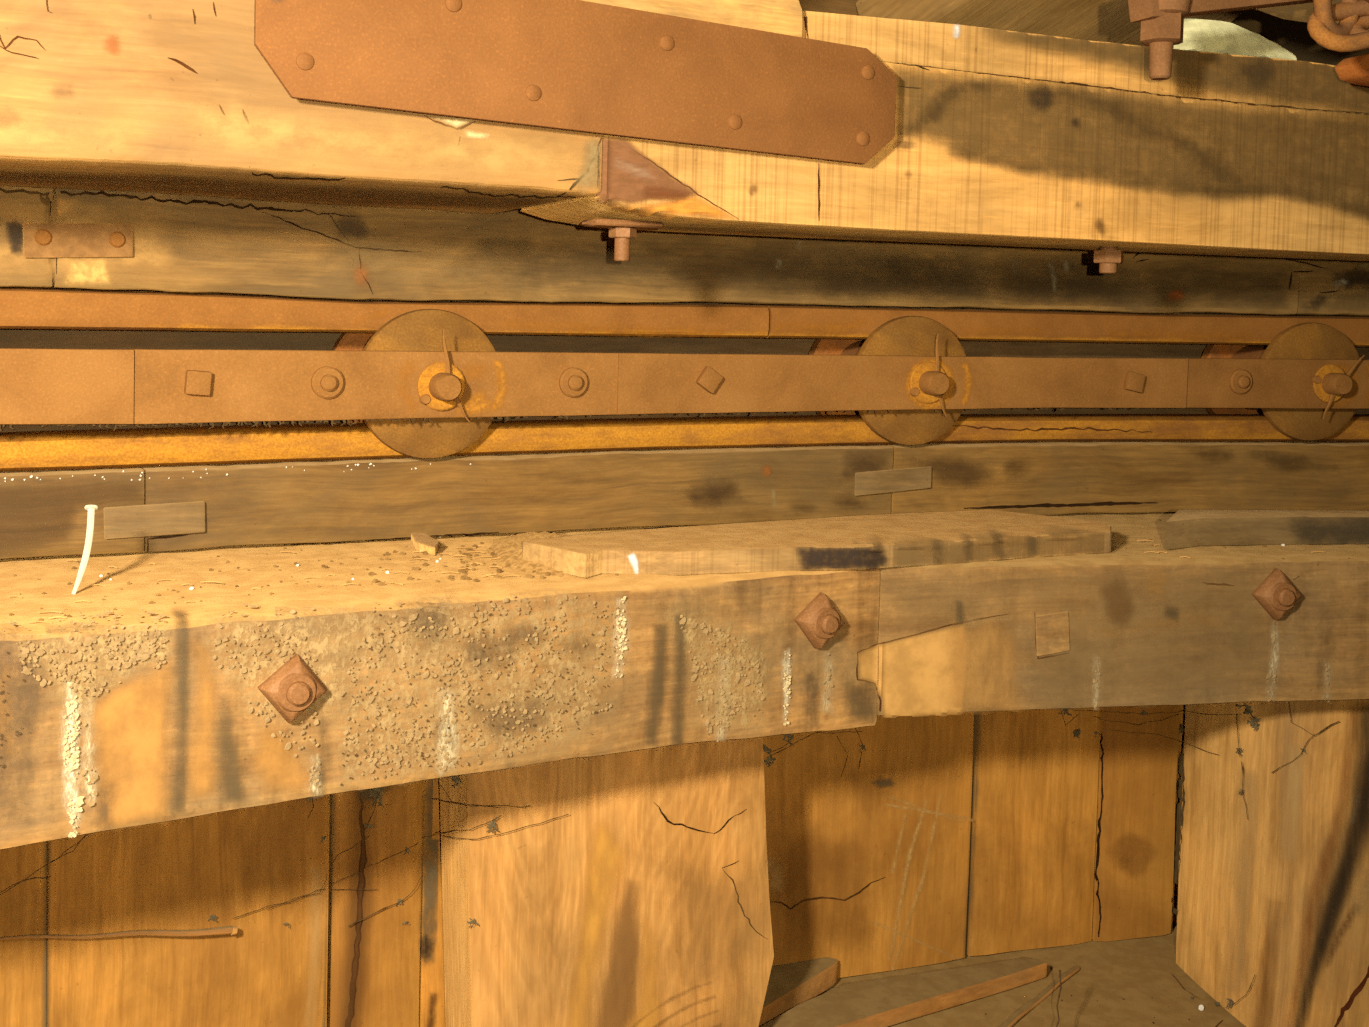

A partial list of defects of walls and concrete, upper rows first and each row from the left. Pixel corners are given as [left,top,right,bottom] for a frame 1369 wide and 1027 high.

crack [441,138,738,219]
crack [0,166,421,294]
corrosion [462,361,505,412]
corrosion [906,359,971,409]
water stain [614,596,628,678]
water stain [649,619,682,744]
water stain [783,651,791,726]
water stain [63,689,107,838]
crack [656,804,746,834]
crack [1095,733,1104,937]
water stain [1314,711,1369,967]
crack [1334,966,1369,1027]